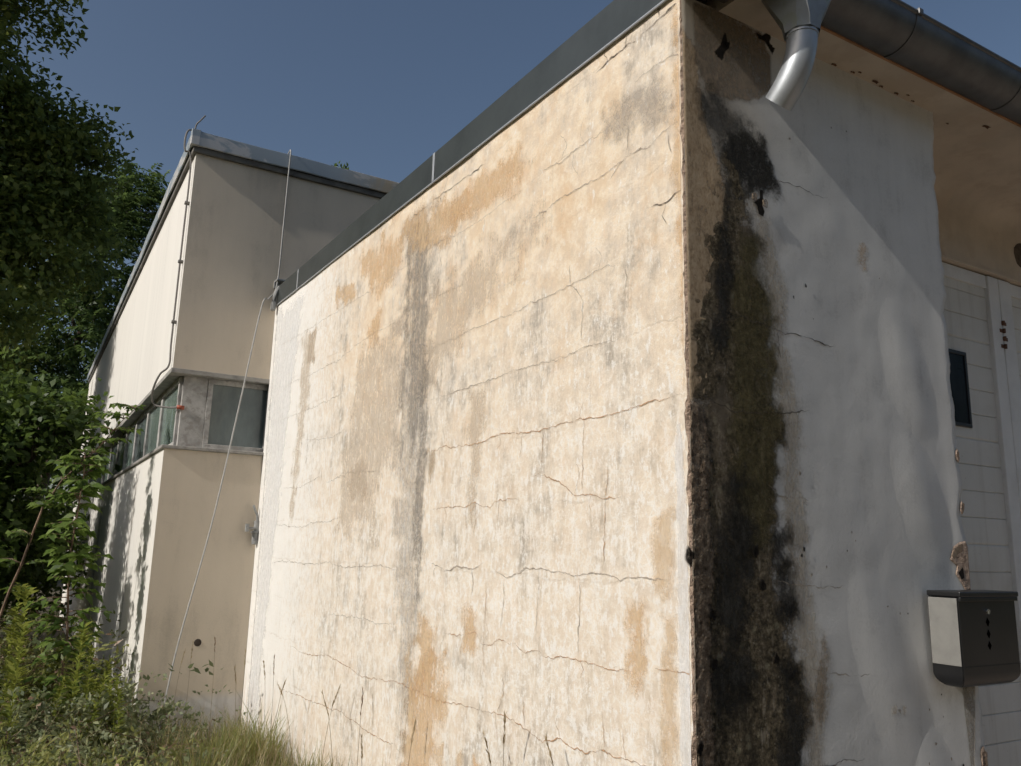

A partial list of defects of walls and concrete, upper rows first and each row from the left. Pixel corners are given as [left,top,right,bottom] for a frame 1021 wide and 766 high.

crack [427,248,627,394]
crack [536,122,671,217]
peeling [693,4,775,101]
water stain [696,88,779,353]
crack [290,399,664,766]
water stain [711,473,758,728]
water stain [757,221,829,766]
spalling [950,541,971,590]